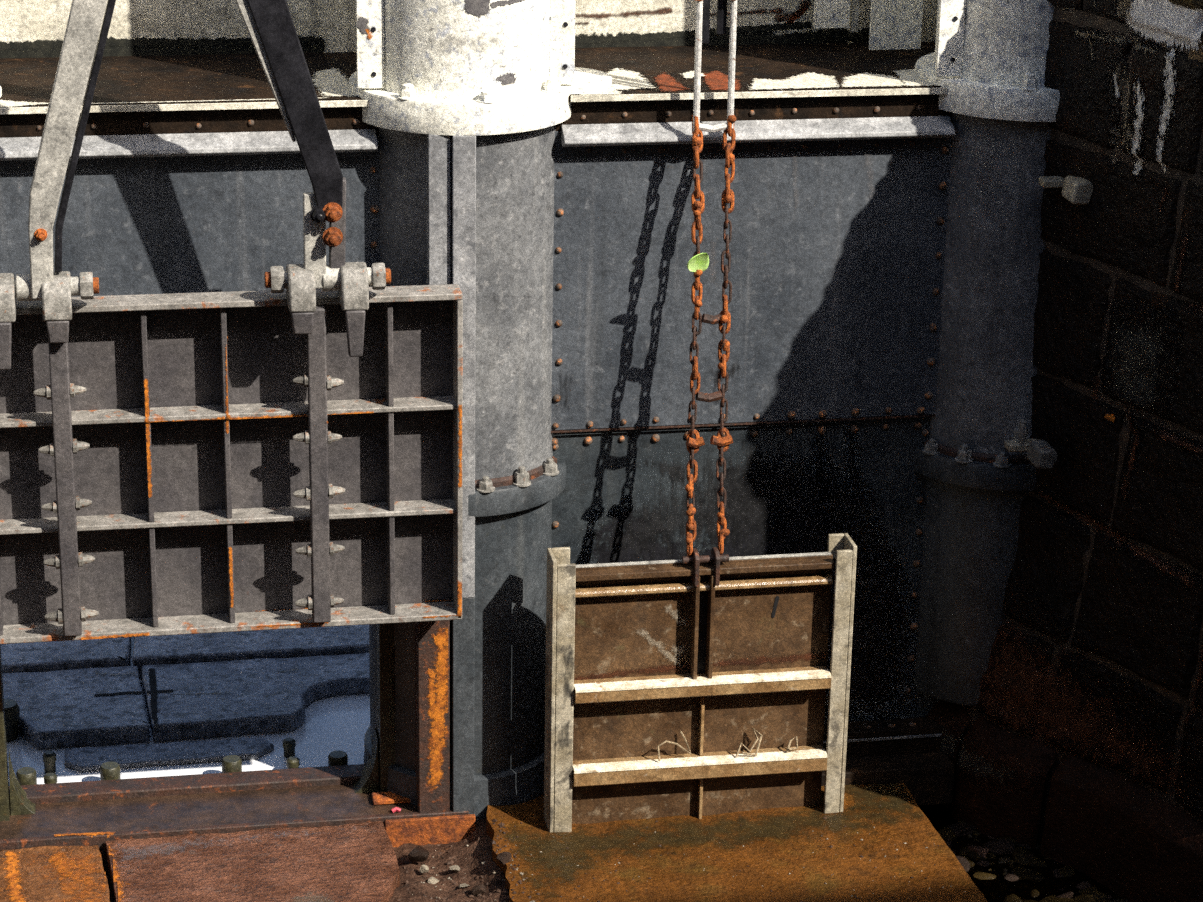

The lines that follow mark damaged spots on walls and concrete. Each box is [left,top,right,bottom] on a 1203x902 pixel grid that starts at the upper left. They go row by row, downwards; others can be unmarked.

damp [1075,31,1176,175]
corrosion [144,336,307,498]
corrosion [81,632,149,640]
corrosion [423,582,462,789]
damp [586,431,912,712]
corrosion [2,851,26,902]
corrosion [43,832,124,902]